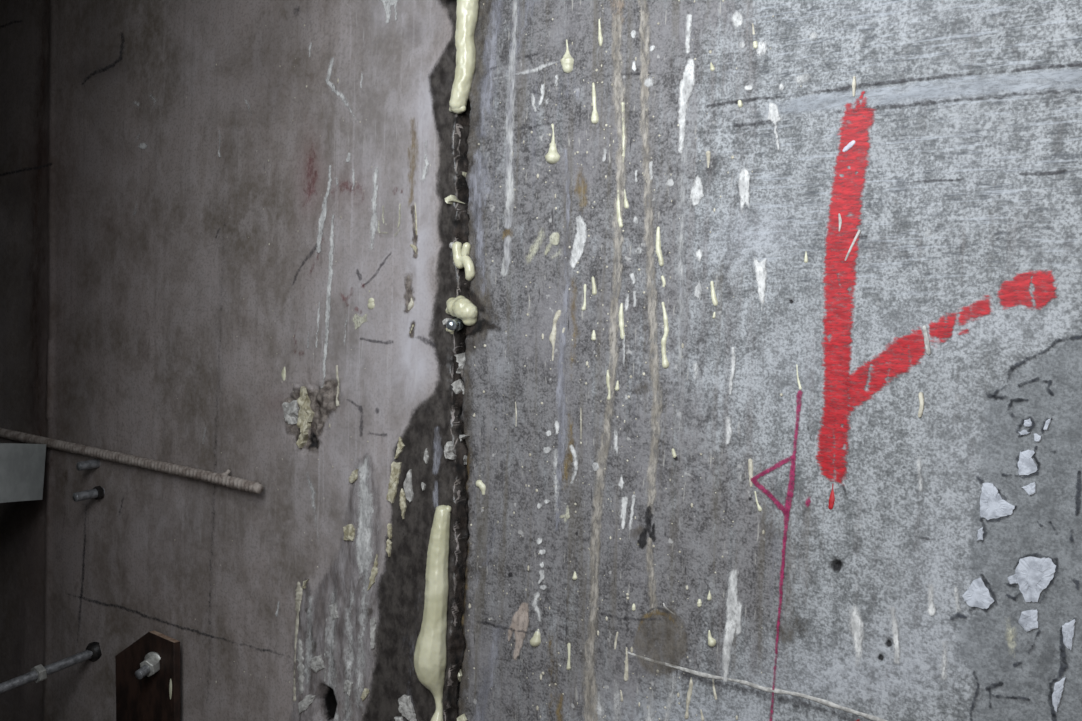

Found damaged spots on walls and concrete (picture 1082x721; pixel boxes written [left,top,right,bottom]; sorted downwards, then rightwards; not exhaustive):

crack [444,98,471,243]
damp [501,0,519,275]
spalling [282,365,340,451]
damp [363,0,501,721]
crack [441,269,534,721]
peeling [977,377,1054,542]
peeling [1008,336,1082,375]
crack [75,535,213,638]
peeling [951,553,1058,666]
peeling [970,671,1030,720]
peeling [1048,618,1076,721]